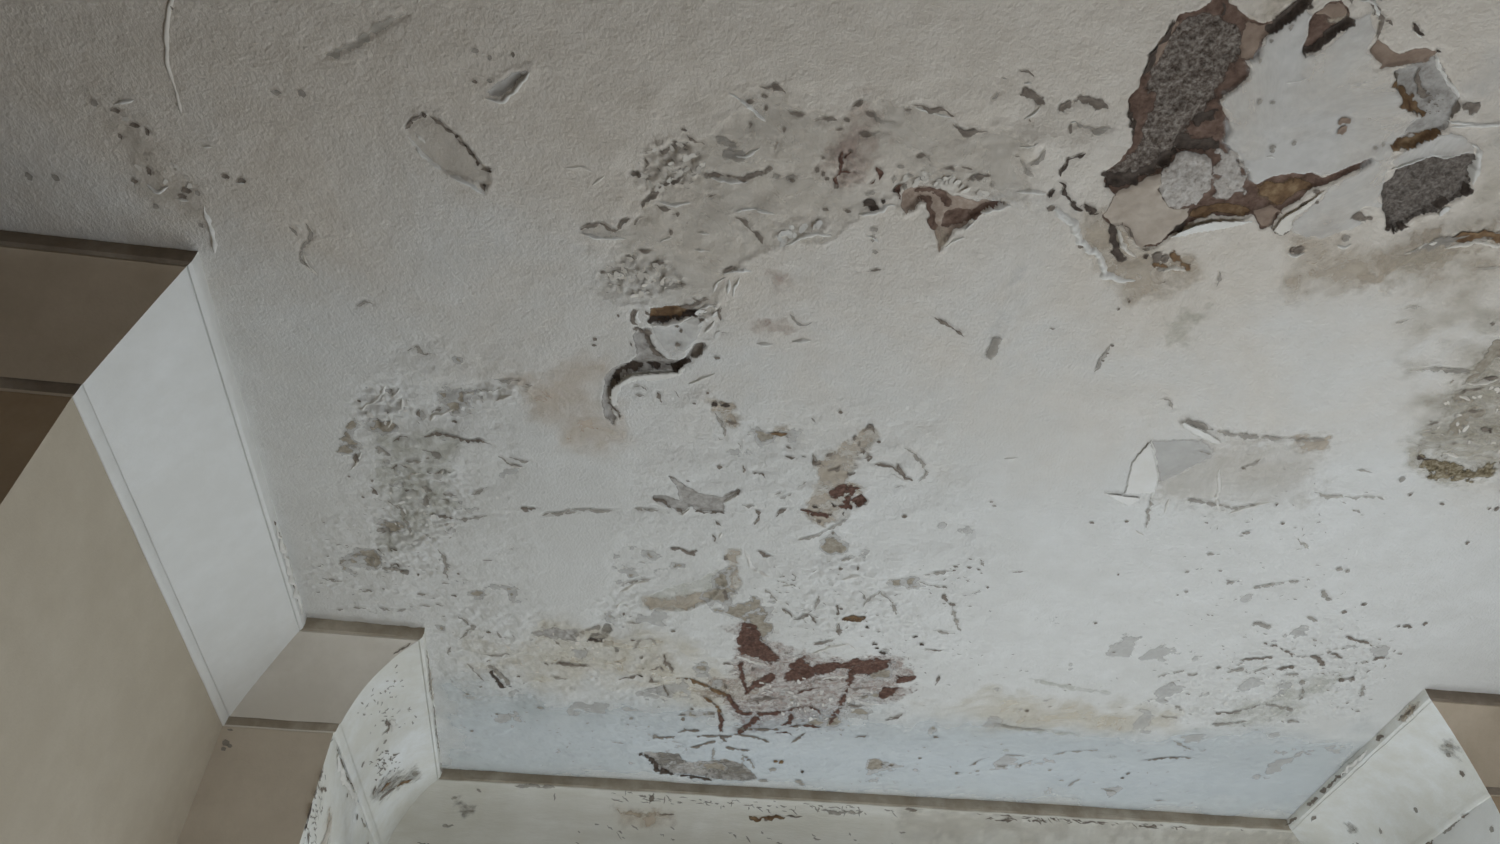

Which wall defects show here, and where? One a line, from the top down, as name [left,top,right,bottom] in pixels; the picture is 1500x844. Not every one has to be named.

peeling [472,52,529,104]
peeling [317,84,989,782]
peeling [1105,399,1331,554]
spalling [1280,468,1384,550]
rust [653,612,942,761]
peeling [1106,553,1402,779]